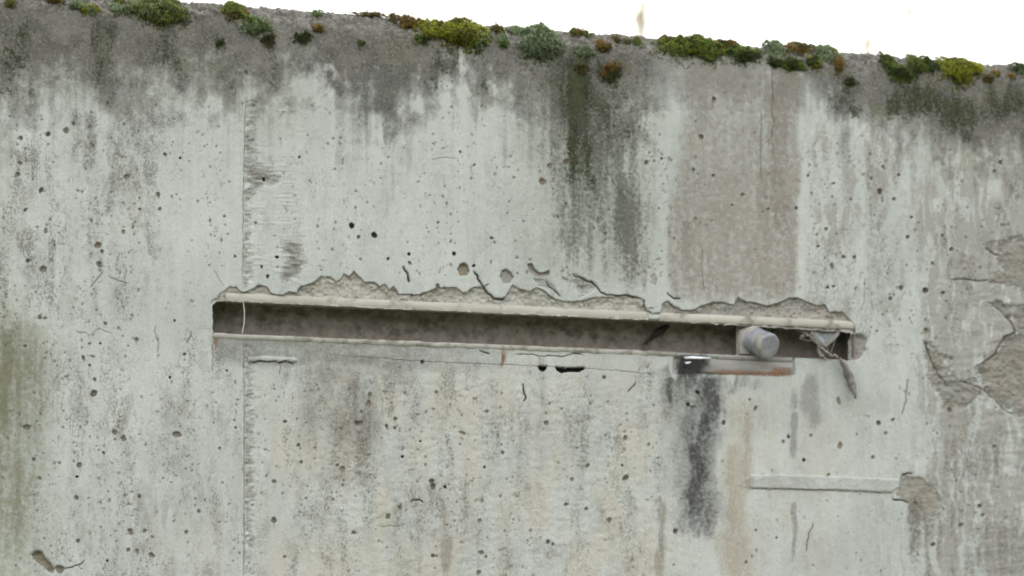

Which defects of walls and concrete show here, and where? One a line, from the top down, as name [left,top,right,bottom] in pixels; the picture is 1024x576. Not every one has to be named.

spalling [211,263,866,360]